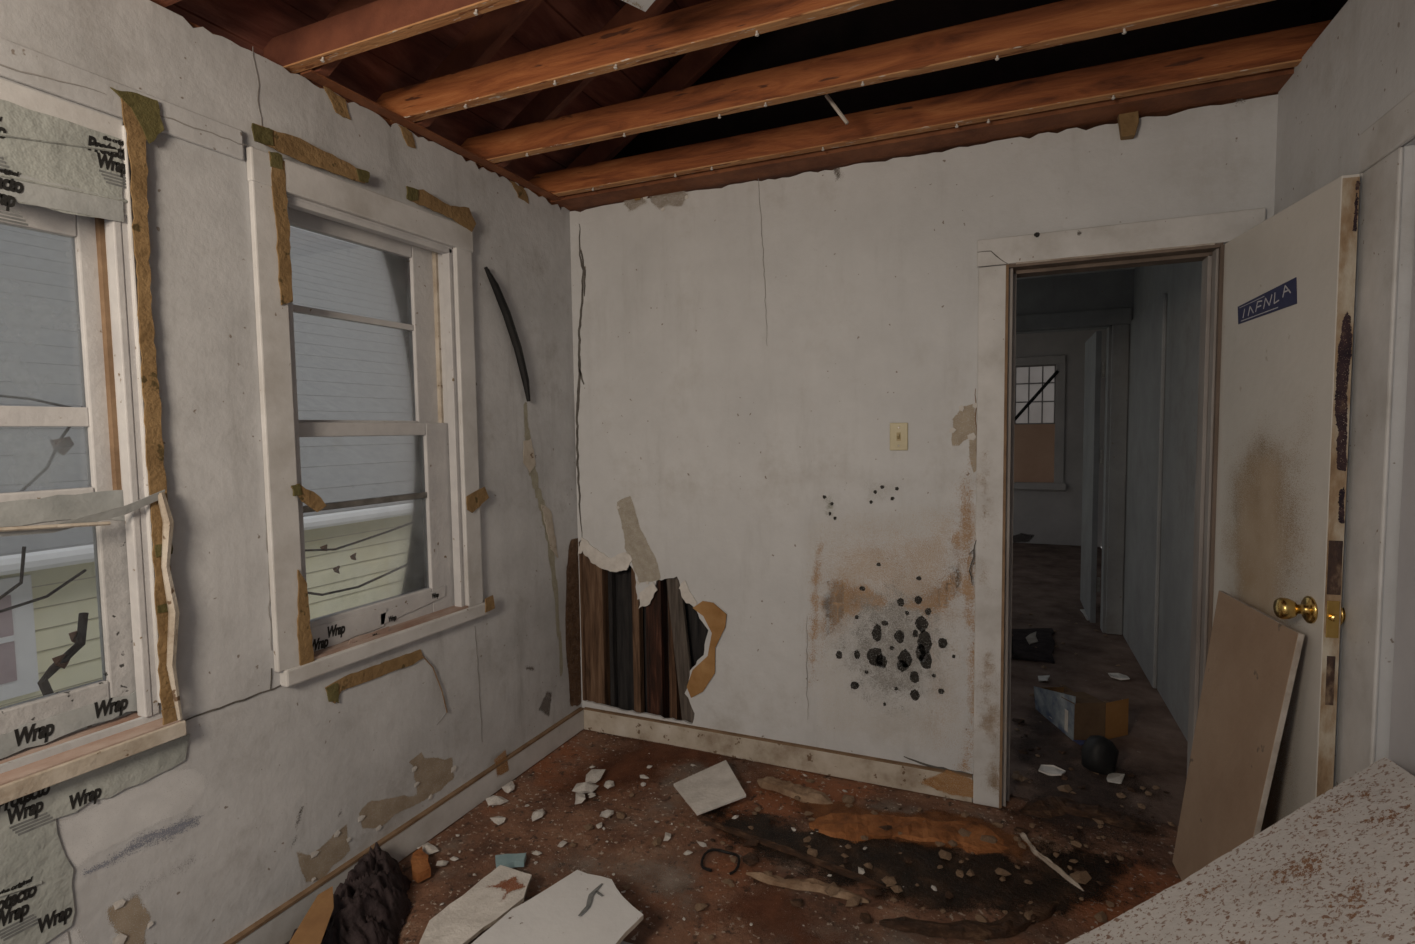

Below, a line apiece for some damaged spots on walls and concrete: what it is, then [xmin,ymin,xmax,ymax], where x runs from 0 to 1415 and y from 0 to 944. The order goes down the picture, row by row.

crack [576,224,586,532]
peeling [950,403,977,473]
peeling [565,496,661,707]
spalling [679,580,697,606]
damp [688,450,1178,921]
peeling [297,752,457,883]
peeling [59,895,157,944]